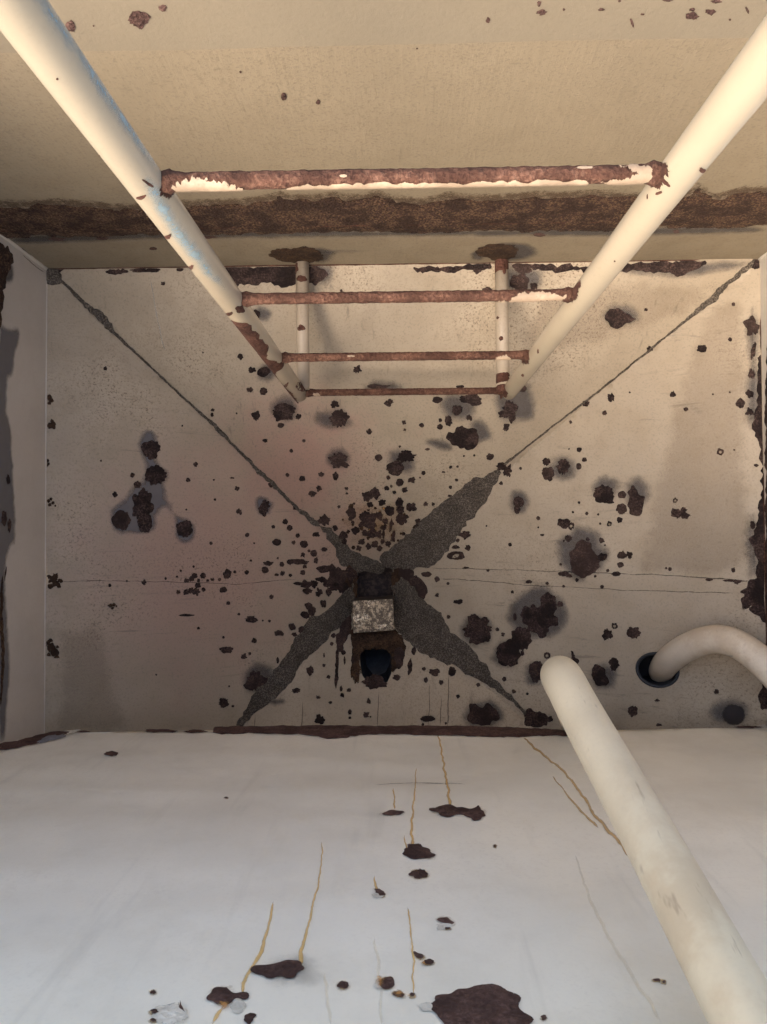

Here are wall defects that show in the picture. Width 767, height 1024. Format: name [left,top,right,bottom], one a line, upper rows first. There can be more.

corrosion [0,199,165,328]
corrosion [182,190,638,290]
corrosion [659,186,767,229]
corrosion [164,385,494,637]
peeling [236,470,527,726]
corrosion [462,479,646,695]
crack [436,568,744,593]
corrosion [705,315,767,623]
corrosion [146,611,627,855]
corrosion [382,771,436,877]
corrosion [206,843,323,1024]
corrosion [374,910,534,1024]